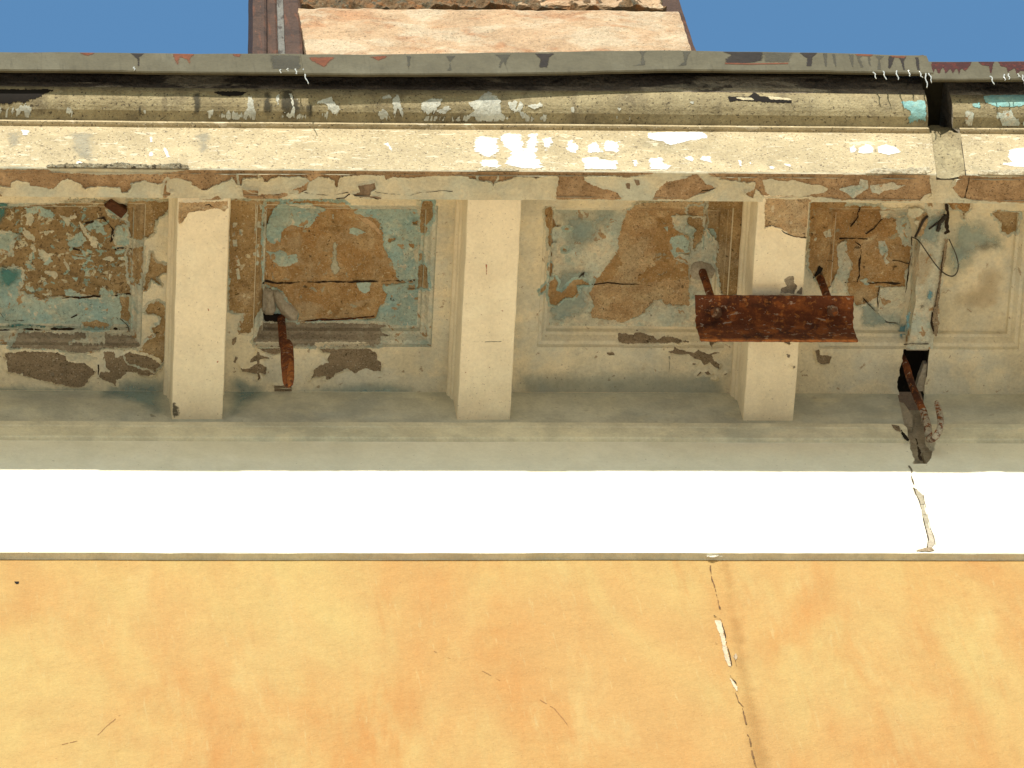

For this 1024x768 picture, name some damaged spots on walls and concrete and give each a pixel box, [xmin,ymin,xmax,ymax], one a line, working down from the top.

crack [262,278,415,286]
crack [303,314,374,322]
peeling [0,89,934,391]
crack [827,178,970,345]
crack [892,425,935,548]
crack [710,565,757,768]